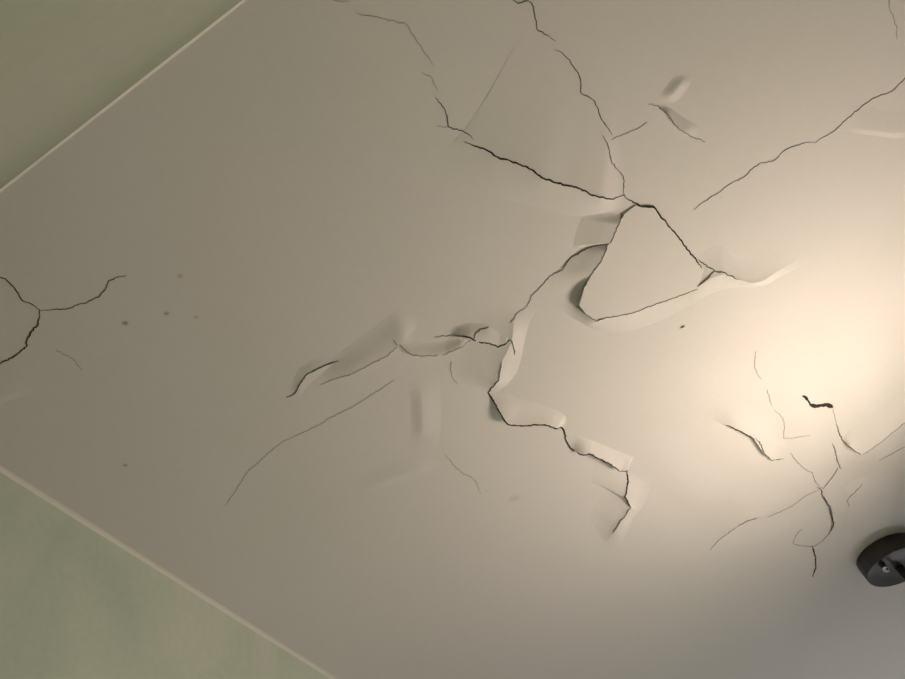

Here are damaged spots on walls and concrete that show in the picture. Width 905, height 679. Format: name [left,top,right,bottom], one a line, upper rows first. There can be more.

crack [694,78,905,210]
crack [0,276,124,364]
crack [321,0,736,533]
crack [228,380,394,502]
crack [710,352,904,576]